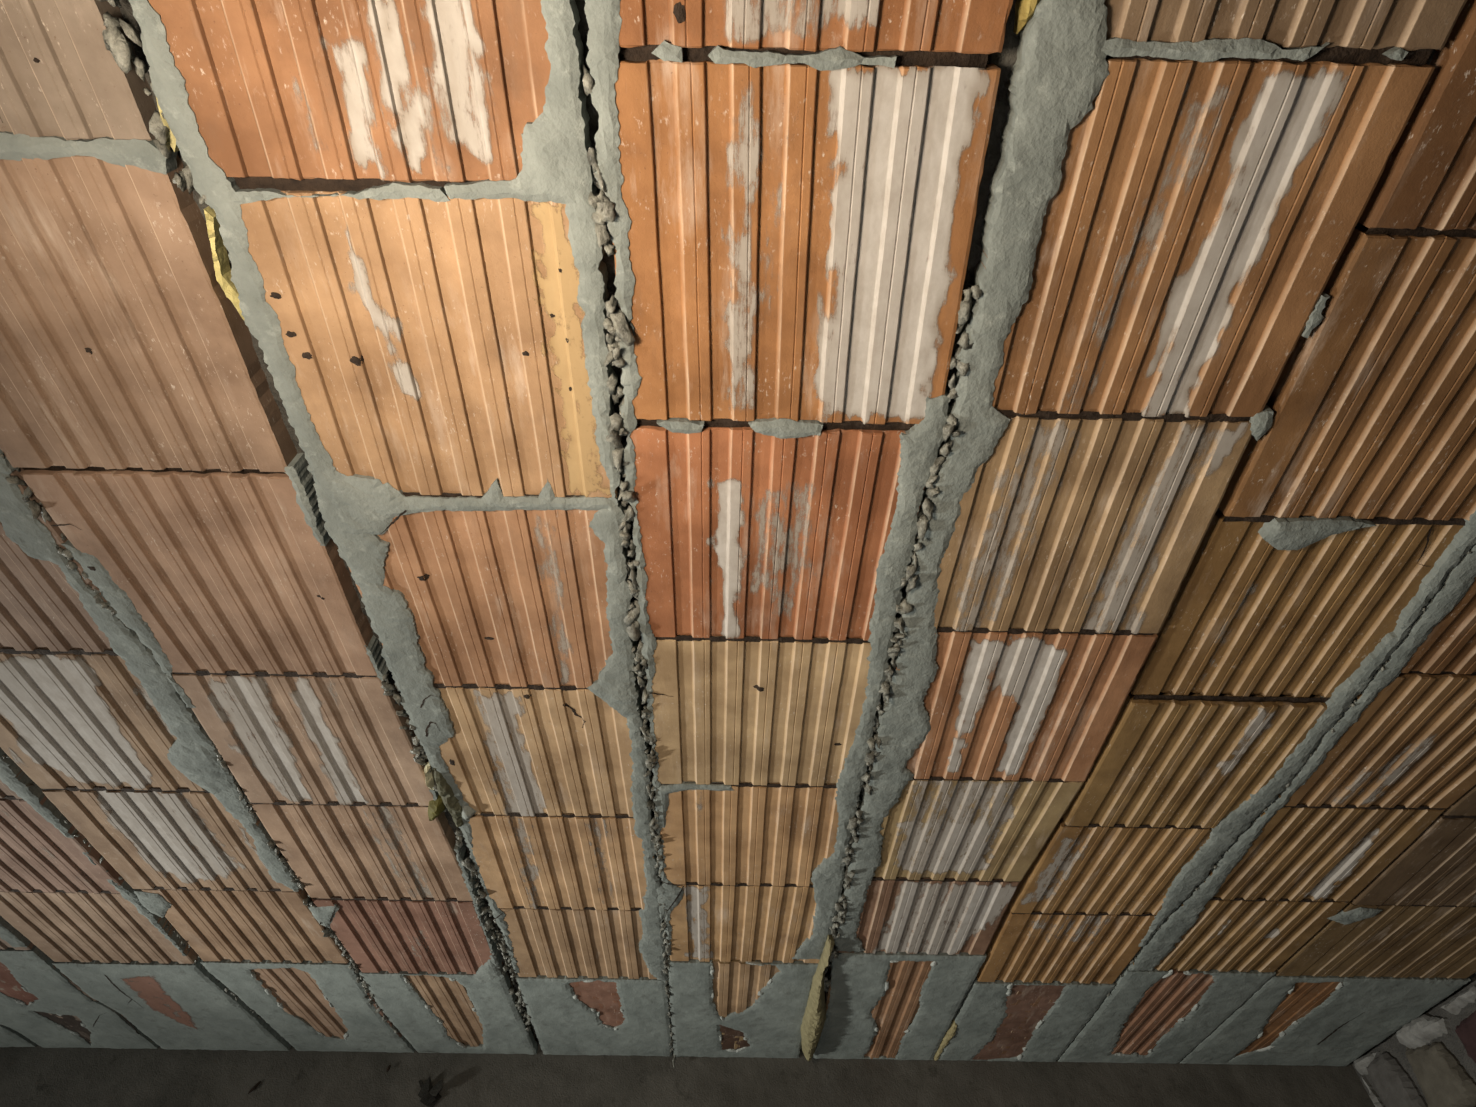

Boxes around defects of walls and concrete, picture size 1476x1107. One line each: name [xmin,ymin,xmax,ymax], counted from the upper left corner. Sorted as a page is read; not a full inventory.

damp [321,0,493,179]
crack [1216,46,1436,66]
efflorescence [814,65,990,424]
damp [1081,67,1349,634]
crack [998,381,1278,422]
crack [0,0,1153,1053]
crack [1348,516,1472,612]
damp [873,374,1110,955]
spalling [251,967,348,1040]
spalling [403,975,484,1048]
spalling [864,961,937,1059]
spalling [1111,970,1214,1056]